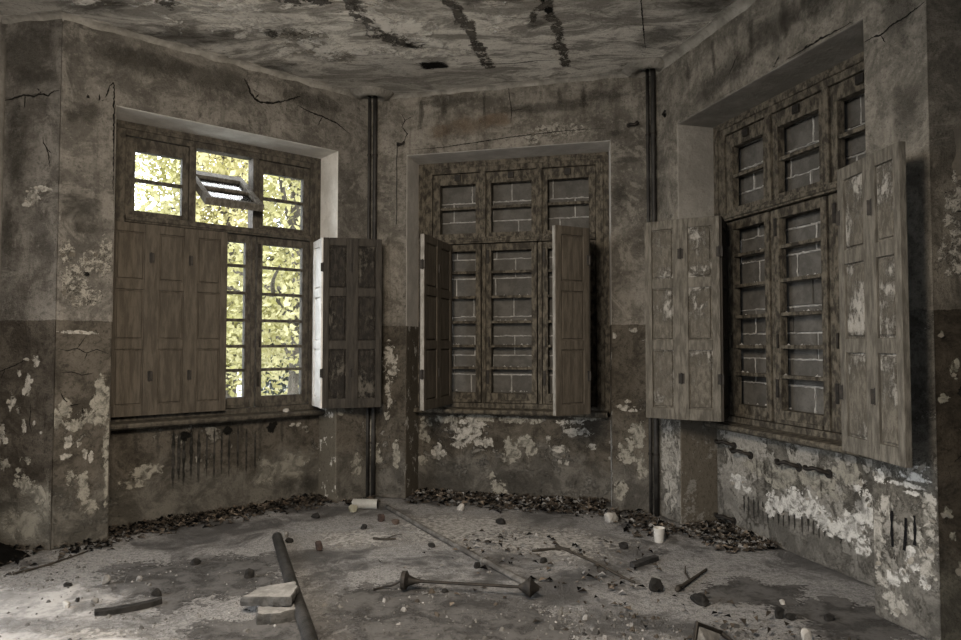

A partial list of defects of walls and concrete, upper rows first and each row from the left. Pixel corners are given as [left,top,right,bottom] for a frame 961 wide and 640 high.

crack [5,86,60,107]
crack [87,82,115,188]
peeling [356,11,413,47]
crack [720,16,853,98]
crack [865,2,924,42]
peeling [6,356,43,434]
peeling [381,339,400,421]
peeling [54,373,164,515]
water stain [177,428,306,484]
peeling [418,399,679,515]
water stain [748,497,842,544]
peeling [730,458,954,618]